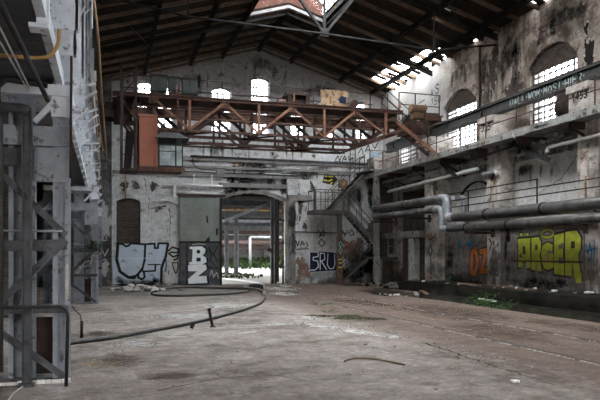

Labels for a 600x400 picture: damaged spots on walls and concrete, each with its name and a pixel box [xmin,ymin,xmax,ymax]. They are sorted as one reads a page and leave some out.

water stain [481,36,521,96]
spalling [583,20,596,66]
peeling [120,180,159,191]